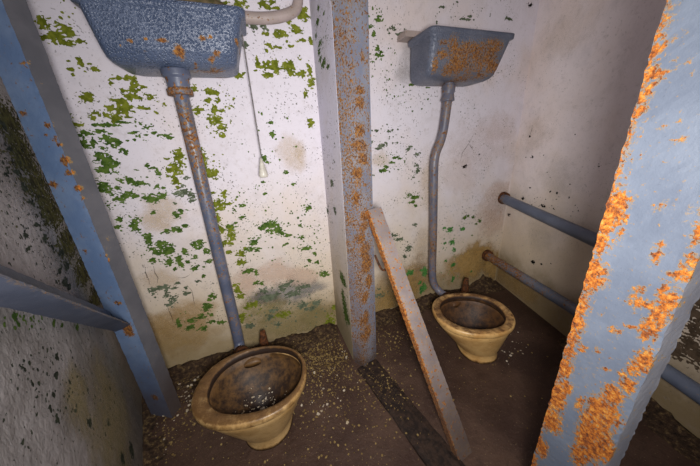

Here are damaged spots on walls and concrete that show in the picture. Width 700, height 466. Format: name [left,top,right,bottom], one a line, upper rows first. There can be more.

water stain [0,96,101,306]
water stain [241,265,328,335]